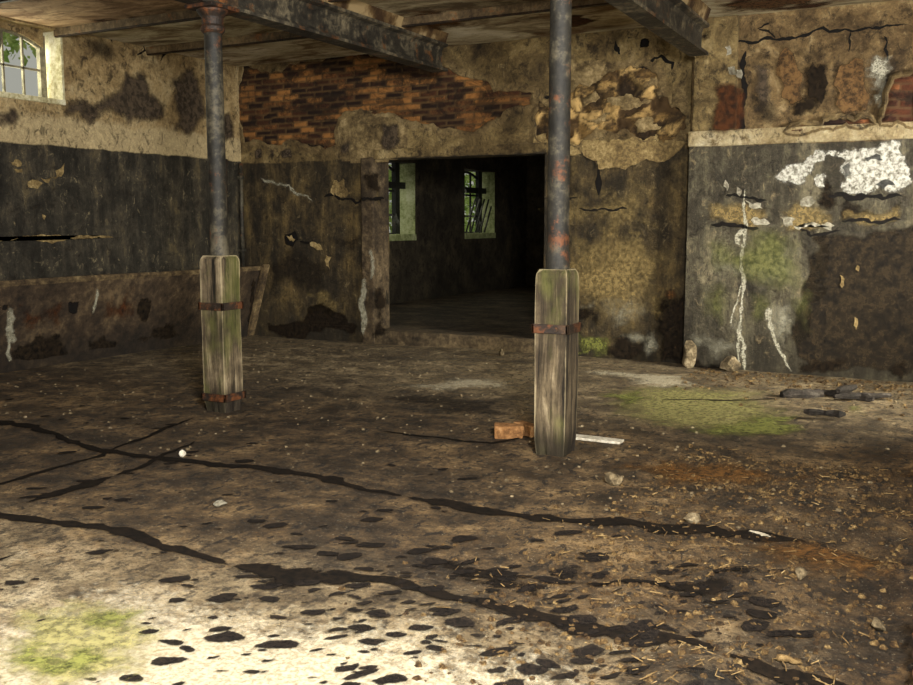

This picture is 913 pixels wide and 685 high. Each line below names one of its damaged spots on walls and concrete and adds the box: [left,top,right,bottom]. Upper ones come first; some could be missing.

rust [572,15,594,27]
spalling [238,54,549,157]
spalling [570,38,692,170]
peeling [728,66,743,78]
spalling [776,47,803,105]
crack [738,23,906,129]
spalling [782,57,913,137]
peeling [0,234,112,244]
crack [664,395,778,403]
crack [0,418,848,685]